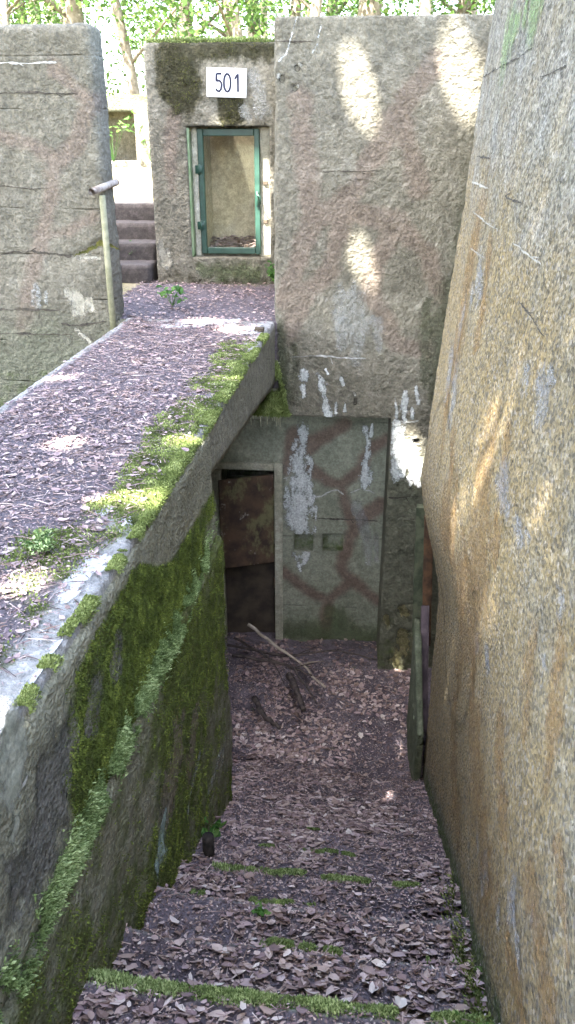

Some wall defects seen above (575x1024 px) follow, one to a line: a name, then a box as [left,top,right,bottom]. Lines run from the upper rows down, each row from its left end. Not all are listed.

water stain [299,368,347,417]
water stain [283,422,318,535]
water stain [360,423,374,490]
water stain [390,385,420,483]
water stain [291,551,310,572]